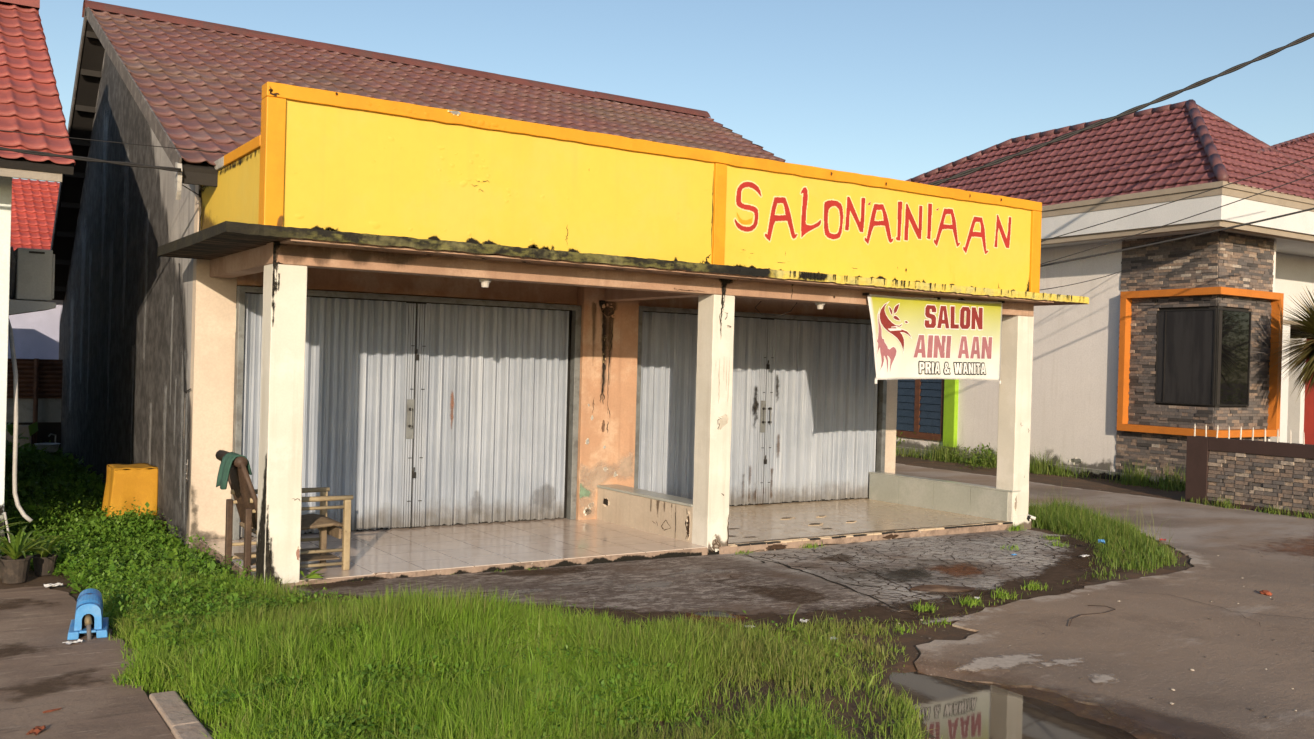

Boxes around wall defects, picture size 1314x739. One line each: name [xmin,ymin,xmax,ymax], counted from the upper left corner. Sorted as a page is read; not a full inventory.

crack [613,174,793,330]
leakage [593,300,616,384]